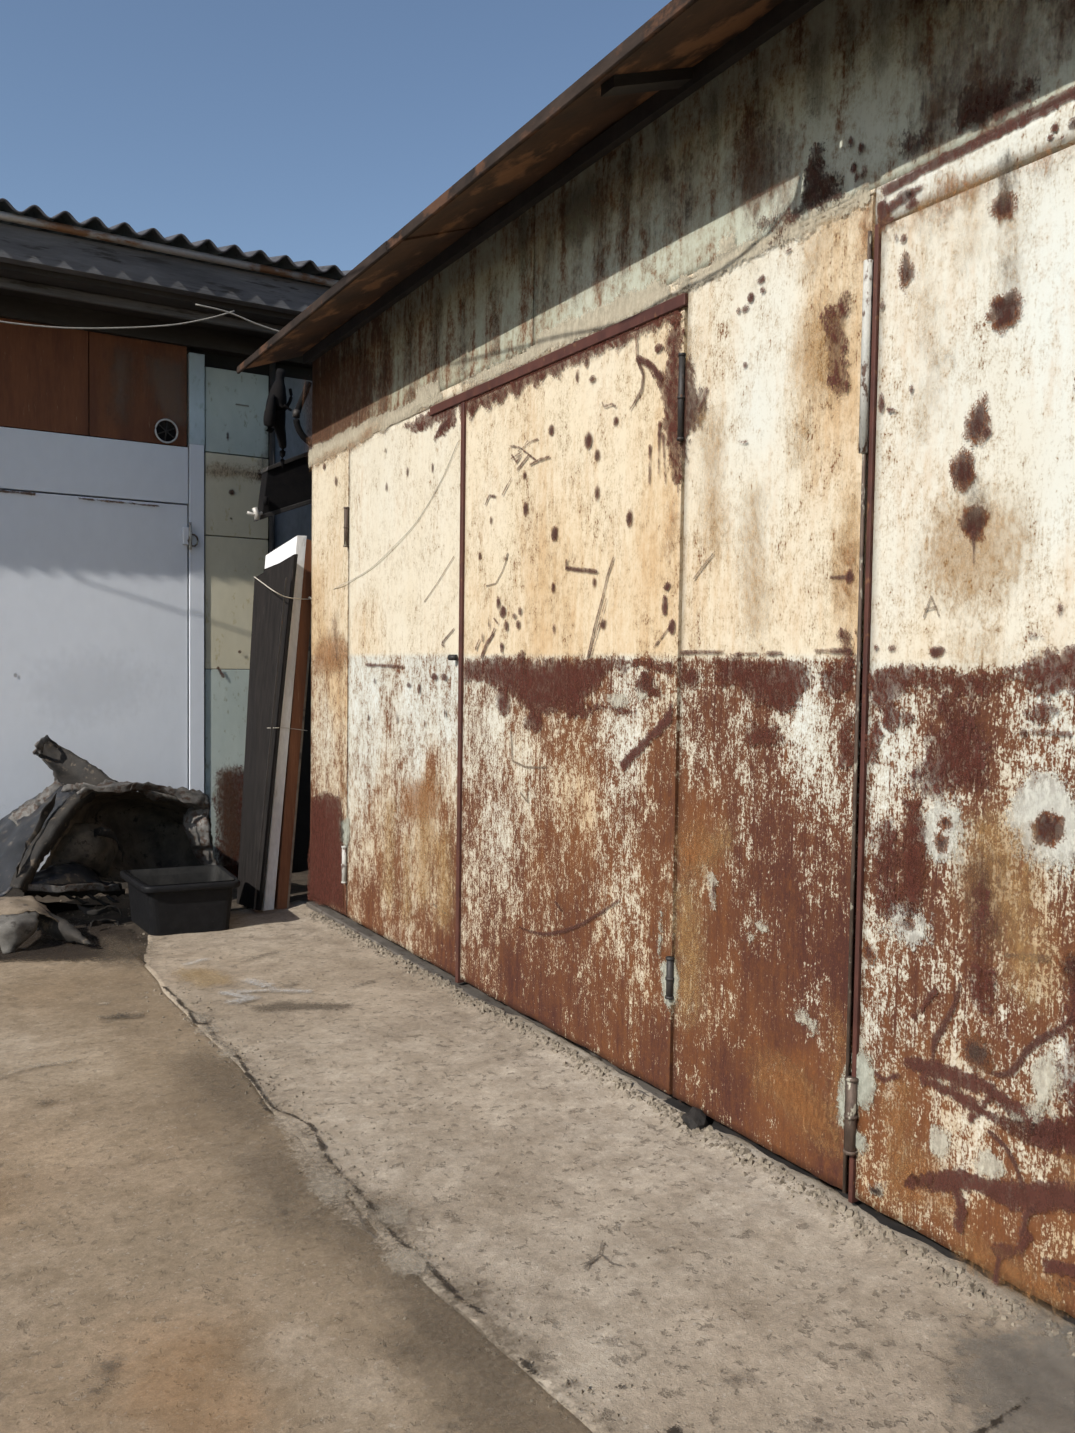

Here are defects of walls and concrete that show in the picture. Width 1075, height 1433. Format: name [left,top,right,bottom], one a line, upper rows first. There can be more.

corrosion [881,0,1075,212]
corrosion [988,189,1020,224]
corrosion [897,249,918,293]
corrosion [985,287,1024,336]
corrosion [925,390,1027,596]
peeling [662,582,675,634]
peeling [365,607,1075,927]
corrosion [920,791,972,863]
corrosion [1002,769,1075,880]
peeling [794,1007,818,1037]
crack [163,986,484,1313]
corrosion [903,1033,1075,1234]